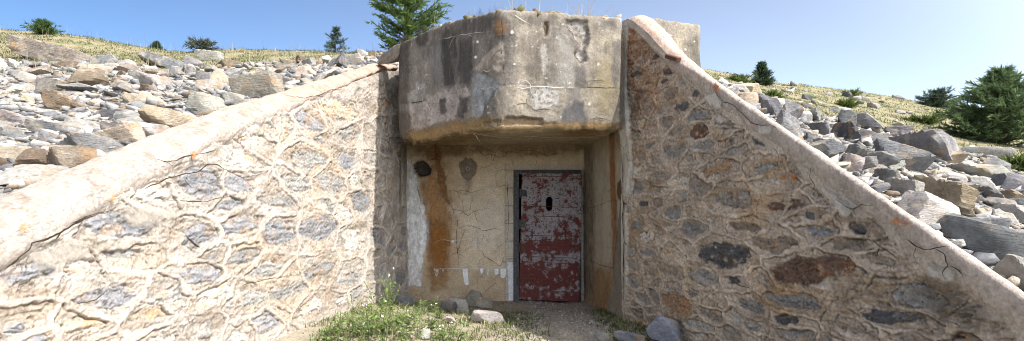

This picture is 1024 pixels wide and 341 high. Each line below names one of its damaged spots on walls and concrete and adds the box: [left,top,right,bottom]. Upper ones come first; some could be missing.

crack [142,132,260,208]
damp [404,158,429,287]
damp [398,13,498,138]
crack [434,185,510,285]
corrosion [410,118,618,291]
damp [454,144,605,294]
crack [716,93,783,172]
crack [873,240,963,279]